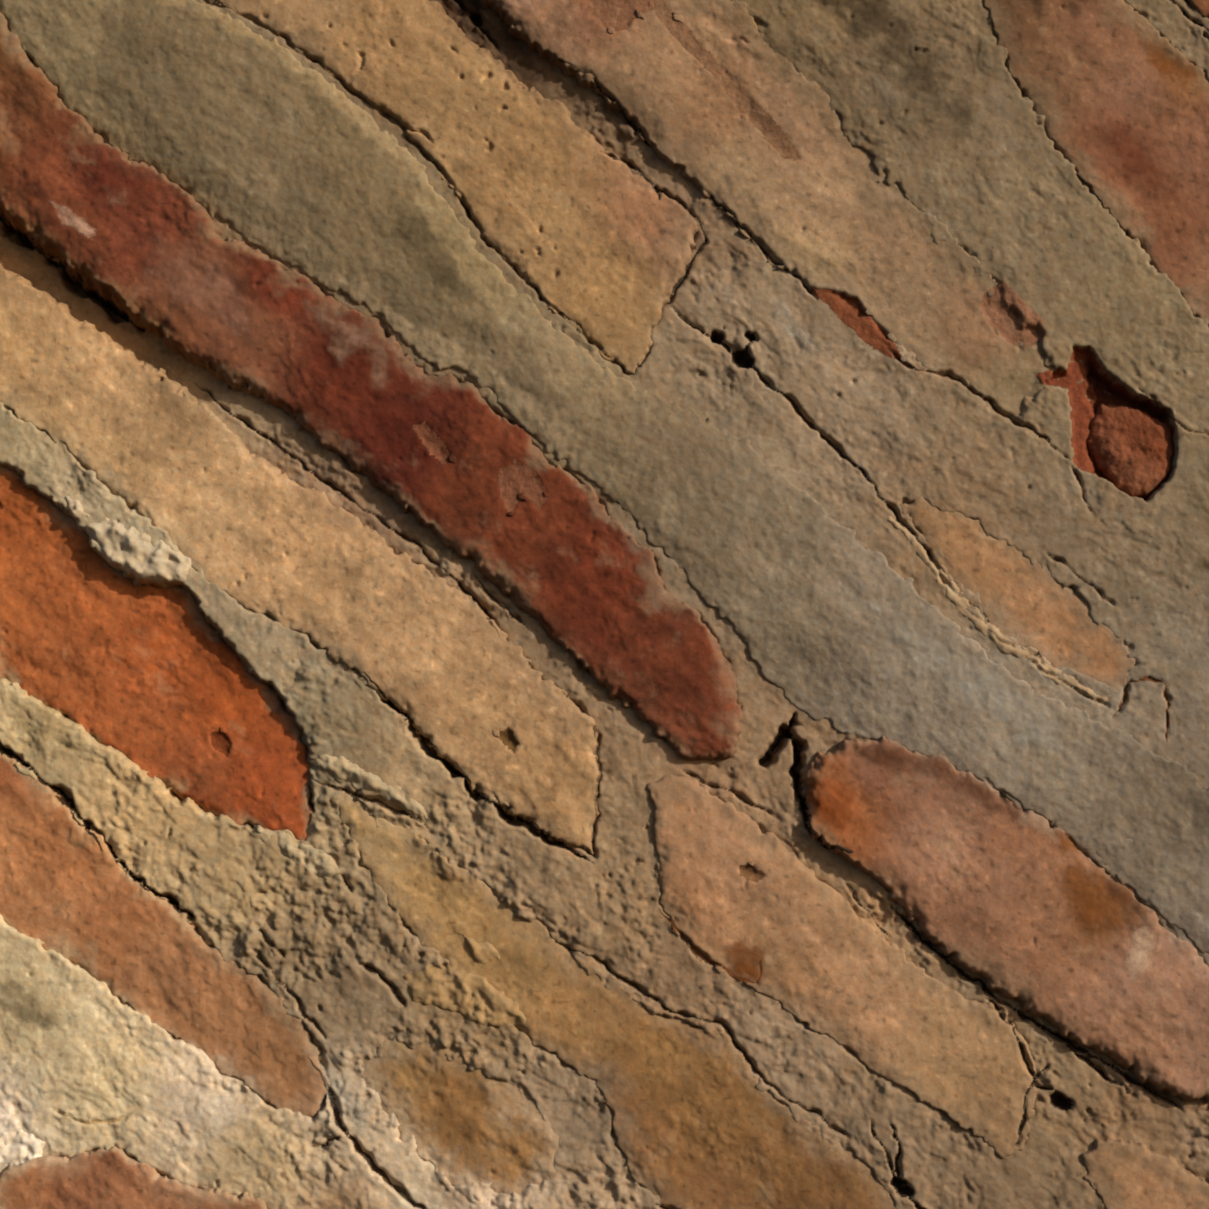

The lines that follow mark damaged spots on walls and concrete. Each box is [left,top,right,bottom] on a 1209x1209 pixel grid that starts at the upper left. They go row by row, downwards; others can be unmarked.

spalling [811,288,908,364]